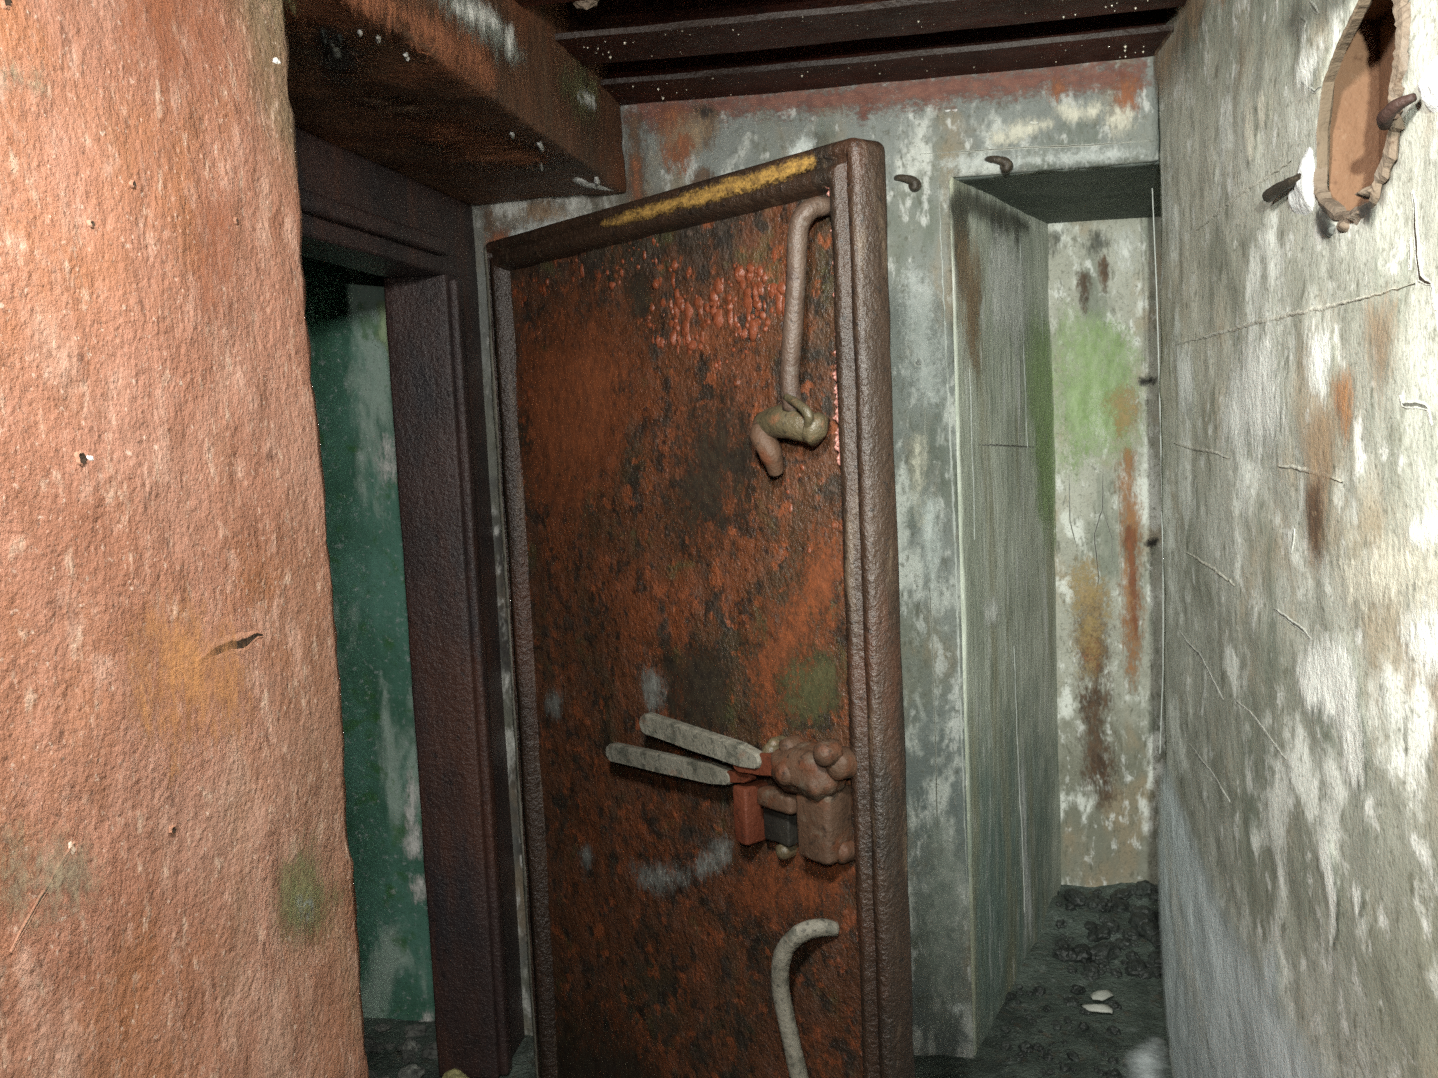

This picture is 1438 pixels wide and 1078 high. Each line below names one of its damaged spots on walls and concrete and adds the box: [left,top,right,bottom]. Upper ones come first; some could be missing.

rust [624,0,1206,201]
spalling [1296,0,1411,240]
leakage [1089,230,1135,270]
leakage [1139,188,1164,754]
rust [746,520,844,724]
rust [1068,449,1141,807]
rust [733,852,853,925]